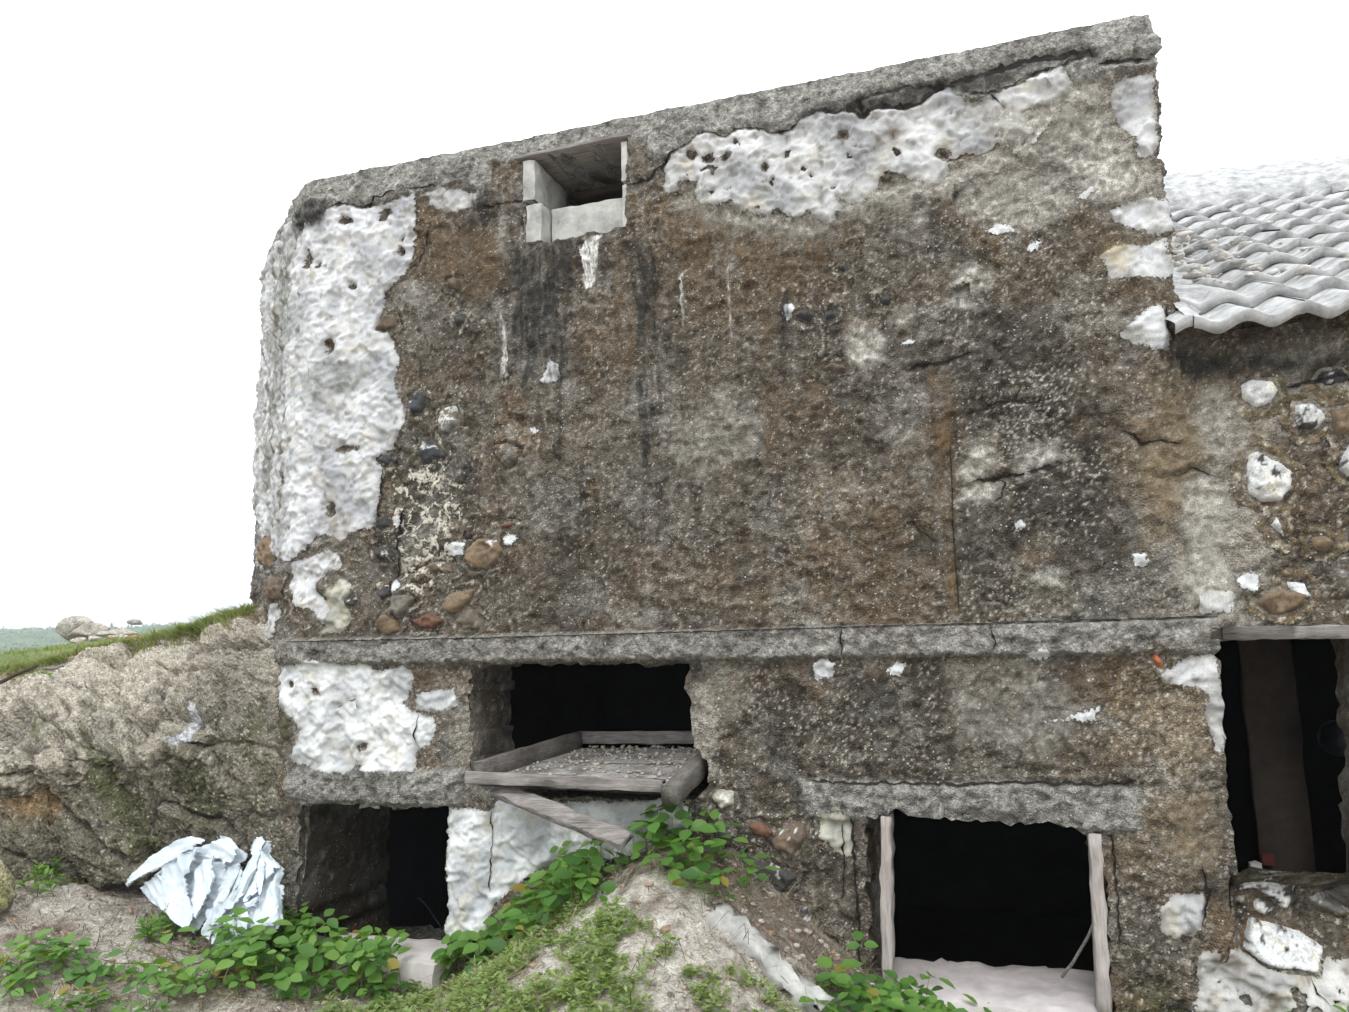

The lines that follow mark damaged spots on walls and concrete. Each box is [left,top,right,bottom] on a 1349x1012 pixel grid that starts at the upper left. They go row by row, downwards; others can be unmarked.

flaking render [662,66,1072,224]
crack [623,48,1149,185]
flaking render [1109,72,1160,158]
damp [500,235,602,386]
damp [635,244,669,337]
flaking render [985,222,1016,235]
flaking render [1099,196,1176,280]
flaking render [1116,303,1171,353]
flaking render [251,185,525,648]
damp [639,380,653,463]
flaking render [277,660,462,776]
flaking render [444,779,856,941]